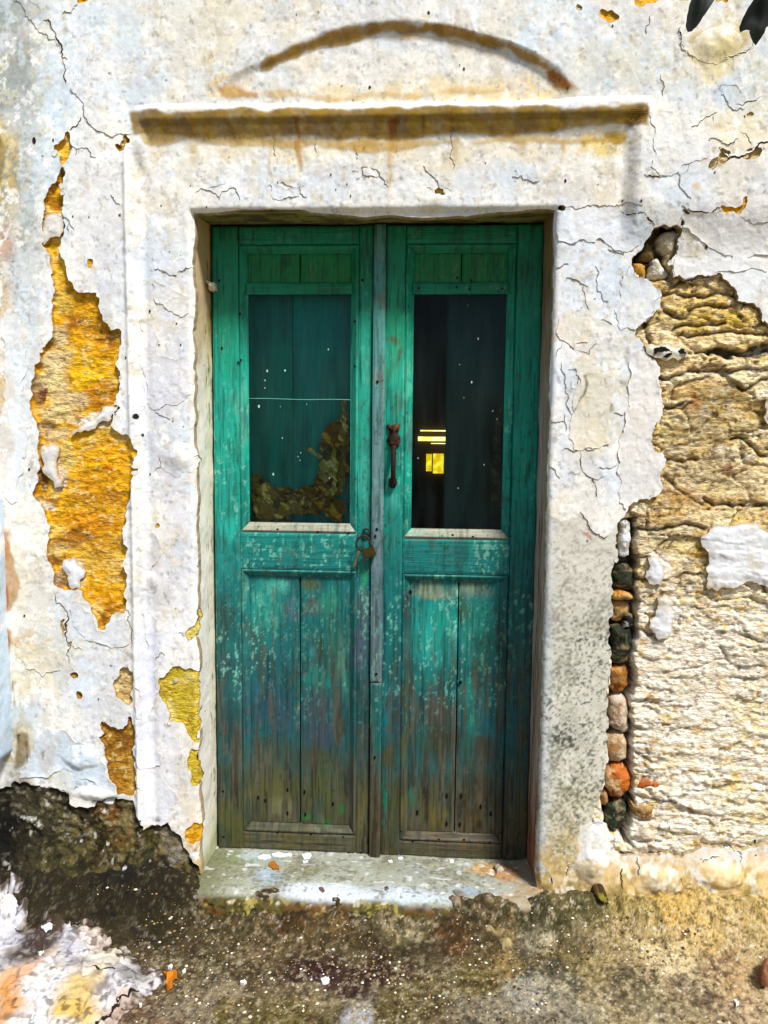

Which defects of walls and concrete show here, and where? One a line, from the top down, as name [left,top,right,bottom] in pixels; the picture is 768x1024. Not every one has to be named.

crack [14,0,130,158]
water stain [131,91,648,166]
water stain [261,21,554,71]
crack [157,267,187,277]
crack [567,202,655,225]
spalling [0,132,196,678]
crack [549,237,634,541]
spalling [554,196,768,856]
spalling [0,608,204,882]